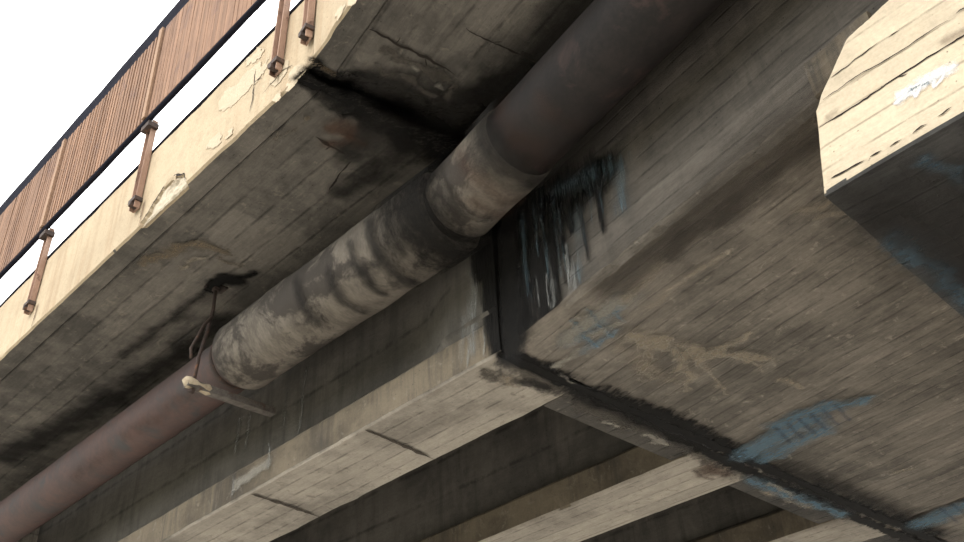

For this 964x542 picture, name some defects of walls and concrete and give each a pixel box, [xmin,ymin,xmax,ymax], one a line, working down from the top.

peeling [335,0,357,20]
crack [370,29,455,75]
leakage [291,0,594,198]
crack [819,8,964,128]
crack [832,107,951,178]
spalling [142,173,188,229]
leakage [657,132,820,264]
leakage [119,295,204,358]
leakage [467,153,946,542]
crack [366,430,430,458]
crack [252,494,319,517]